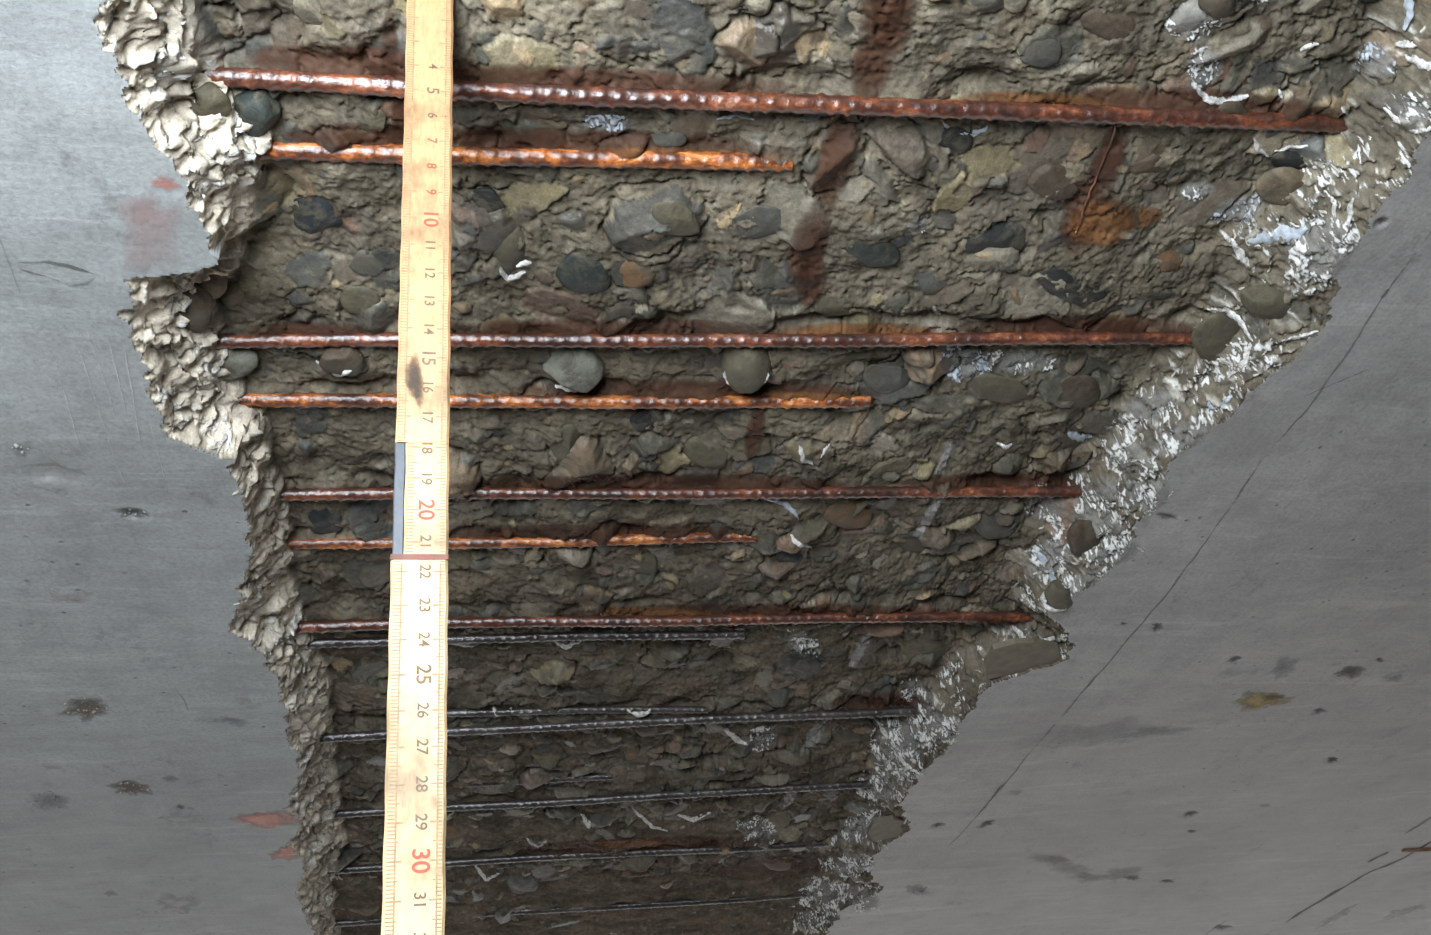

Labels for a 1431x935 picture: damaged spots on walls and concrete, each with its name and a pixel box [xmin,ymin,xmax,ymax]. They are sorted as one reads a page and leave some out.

rust [256,24,405,78]
rust [453,59,765,92]
rust [296,97,404,151]
rust [452,129,762,159]
rust [453,320,754,337]
crack [1285,280,1395,434]
rust [554,380,853,456]
spalling [93,0,407,935]
spalling [444,0,1431,935]
crack [1067,479,1249,710]
crack [967,756,1027,827]
crack [1292,823,1431,918]